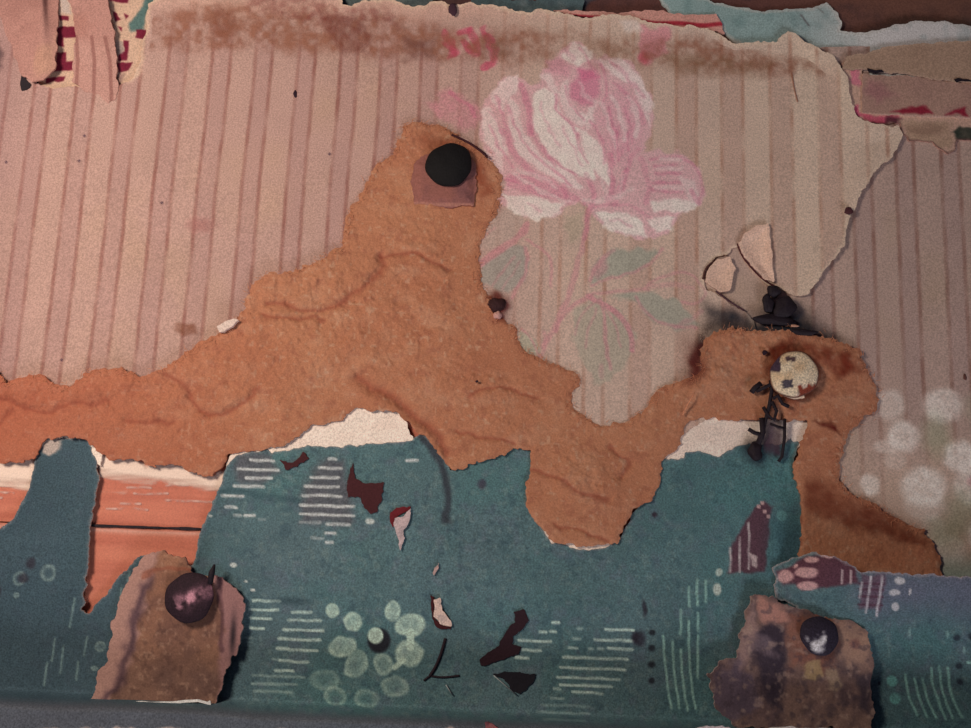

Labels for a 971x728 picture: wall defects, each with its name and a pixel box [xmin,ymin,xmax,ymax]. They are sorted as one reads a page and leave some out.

peeling [0,0,119,103]
peeling [705,223,775,293]
peeling [217,318,239,333]
peeling [0,459,34,499]
peeling [99,456,224,511]
peeling [394,509,411,550]